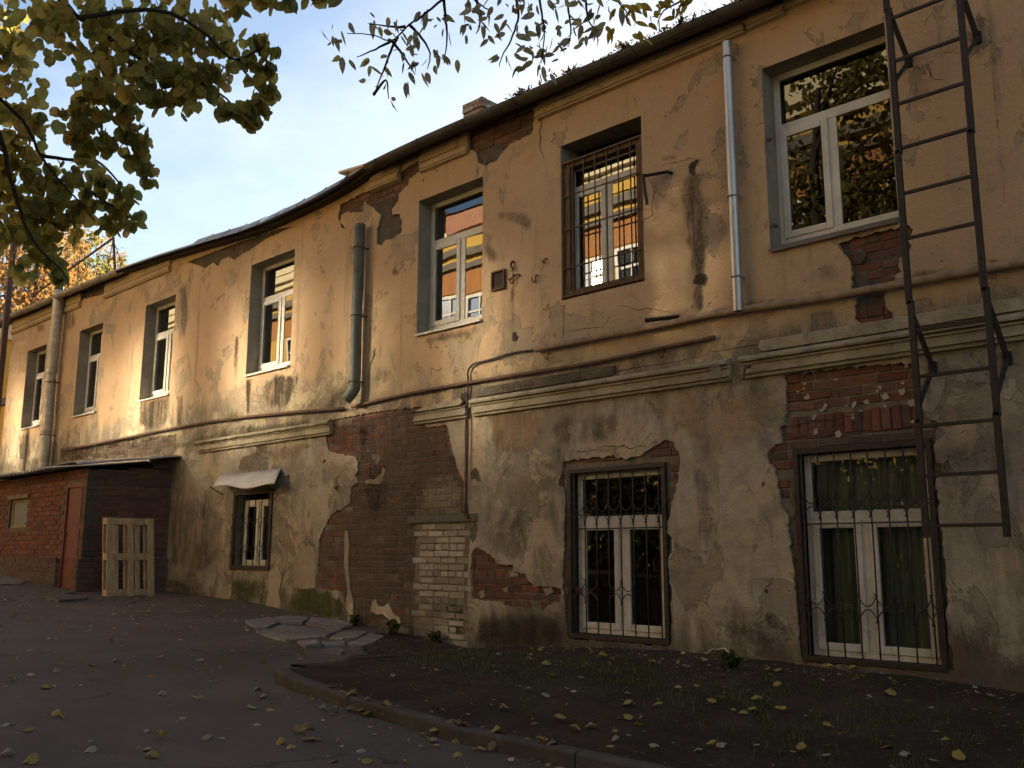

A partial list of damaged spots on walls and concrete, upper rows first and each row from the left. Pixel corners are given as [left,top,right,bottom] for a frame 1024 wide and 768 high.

spalling [338,161,424,245]
spalling [469,109,534,173]
damp [687,175,705,309]
spalling [838,225,913,323]
spalling [316,390,680,647]
spalling [762,362,955,670]